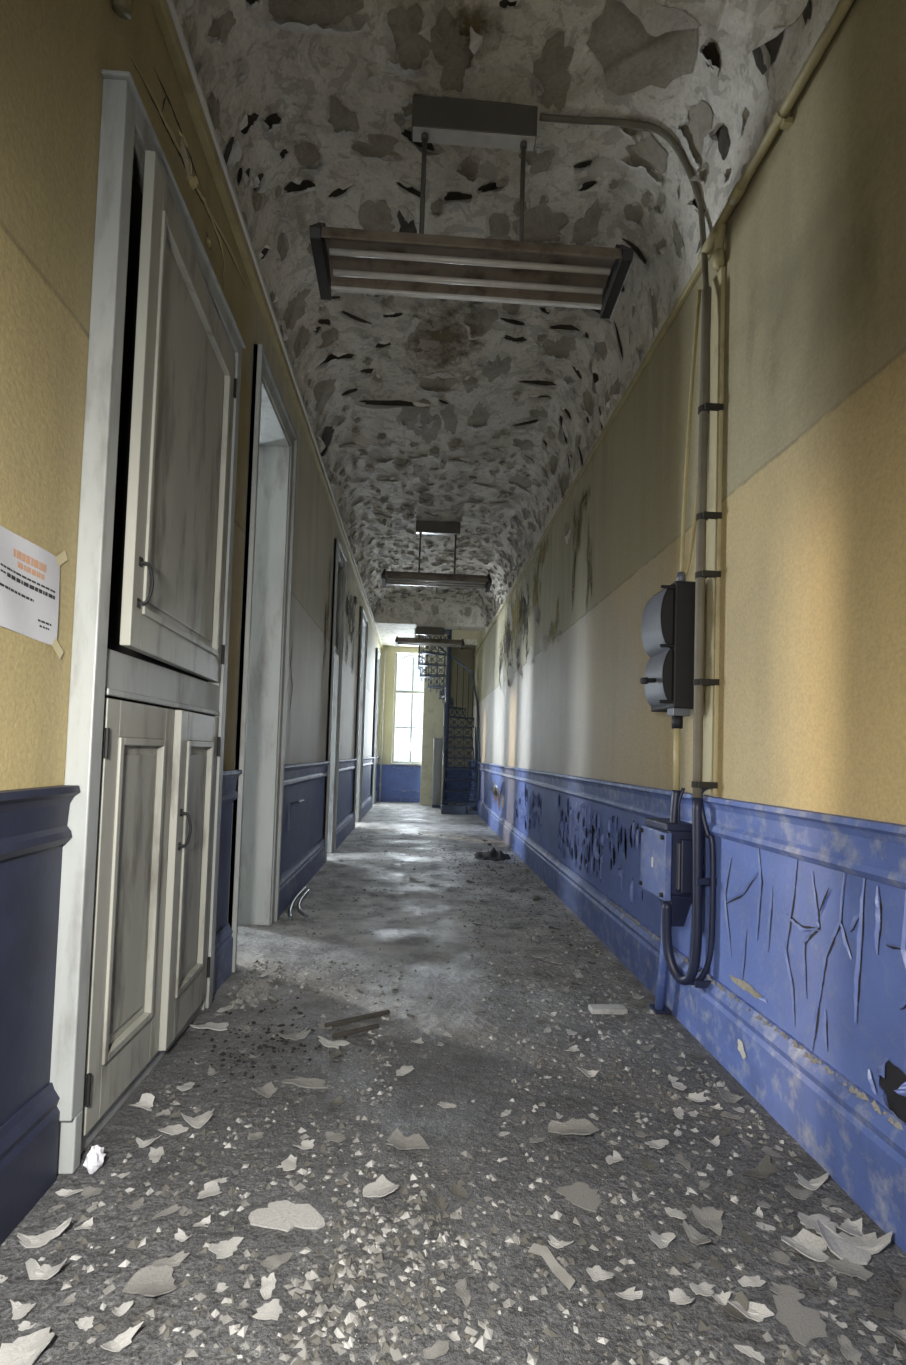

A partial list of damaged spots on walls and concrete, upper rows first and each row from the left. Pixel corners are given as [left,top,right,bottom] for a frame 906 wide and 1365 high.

crack [130,54,246,293]
peeling [189,0,483,239]
peeling [358,156,508,233]
peeling [497,0,521,10]
peeling [485,100,765,269]
peeling [527,0,811,113]
peeling [270,278,673,693]
crack [724,848,906,1051]
crack [868,1069,878,1094]
peeling [877,1057,906,1123]